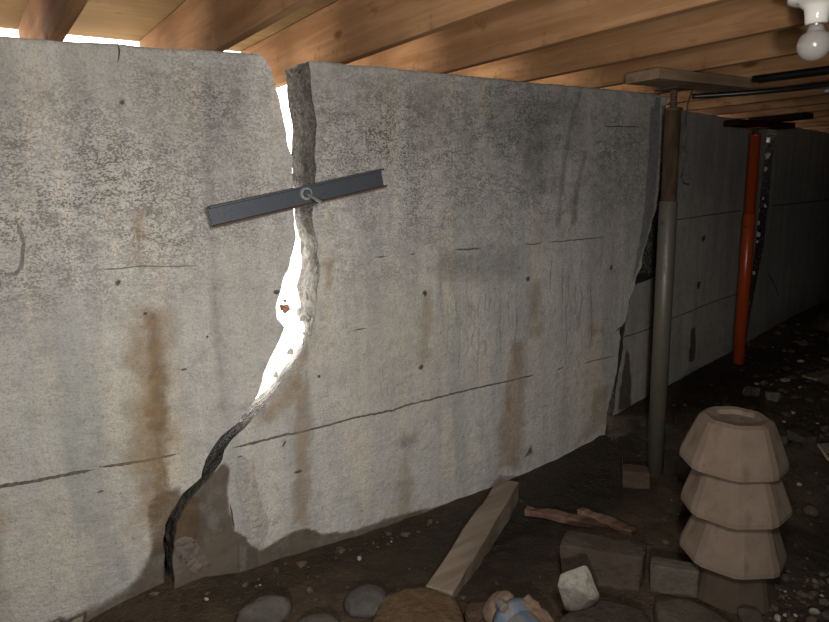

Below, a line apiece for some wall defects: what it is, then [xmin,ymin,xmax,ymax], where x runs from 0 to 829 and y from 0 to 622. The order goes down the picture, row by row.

crack [285,61,317,187]
crack [0,220,26,290]
crack [101,263,195,271]
crack [527,237,602,245]
crack [586,129,829,415]
crack [163,204,532,586]
crack [0,453,179,489]